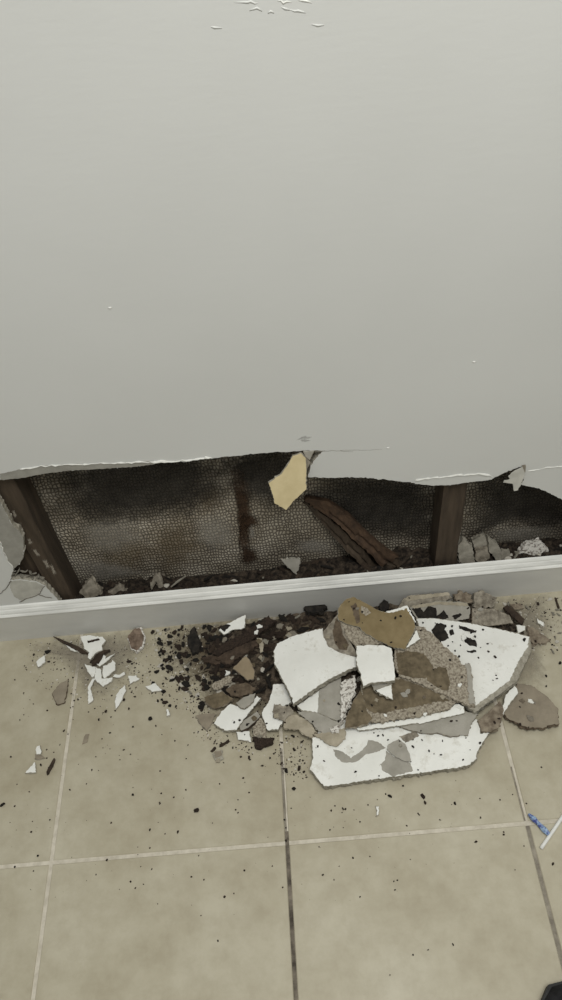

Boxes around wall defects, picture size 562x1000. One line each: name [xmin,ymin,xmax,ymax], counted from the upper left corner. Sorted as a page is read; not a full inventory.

water stain [63,452,291,517]
spalling [0,450,562,600]
water stain [325,477,432,533]
water stain [477,474,562,530]